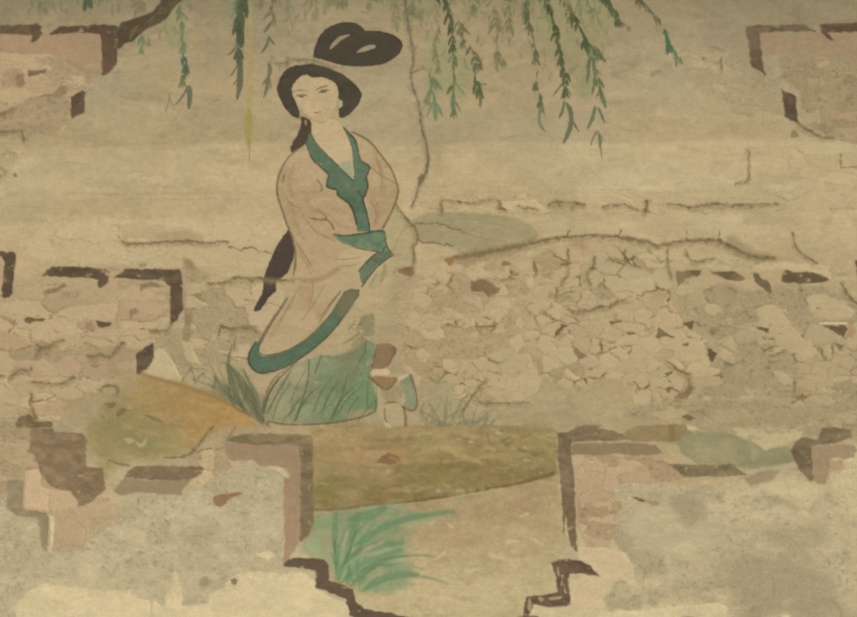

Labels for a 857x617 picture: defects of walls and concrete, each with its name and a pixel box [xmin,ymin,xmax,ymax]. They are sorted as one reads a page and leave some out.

peeling [0,52,87,185]
crack [392,0,820,318]
peeling [417,47,857,219]
crack [839,282,857,312]
peeling [0,217,349,617]
crack [459,376,532,419]
crack [662,359,697,404]
damp [665,489,712,530]
damp [711,516,848,617]